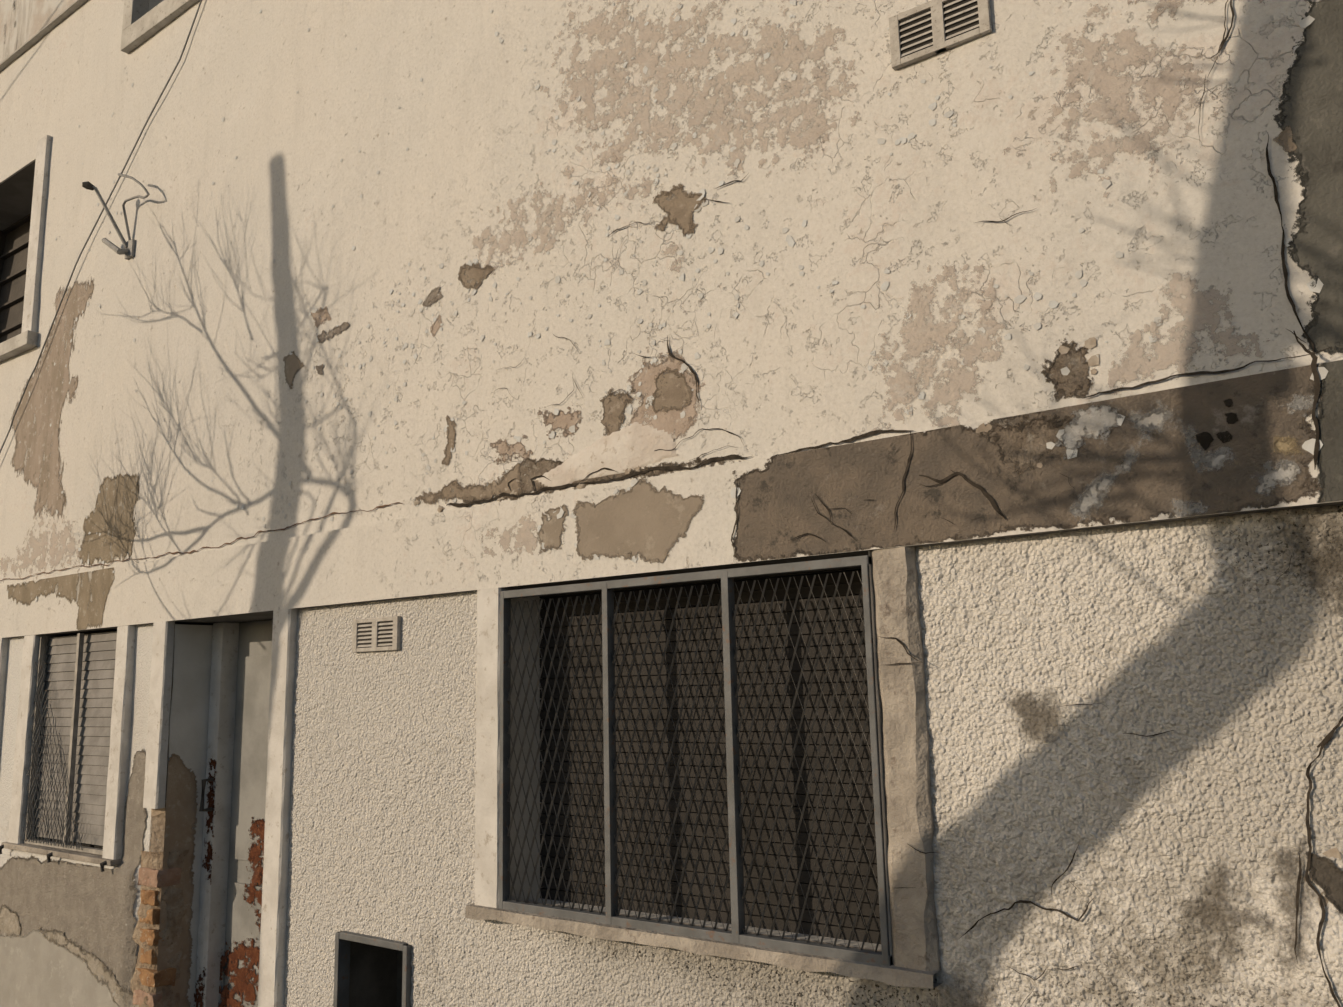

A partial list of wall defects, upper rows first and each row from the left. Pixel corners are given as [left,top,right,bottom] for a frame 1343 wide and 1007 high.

peeling [11,281,101,518]
peeling [7,473,140,630]
crack [0,502,402,581]
spalling [372,259,532,337]
crack [446,334,1007,562]
crack [1067,132,1331,469]
spalling [0,749,198,1007]
crack [1294,716,1343,1007]
spalling [1304,847,1343,914]